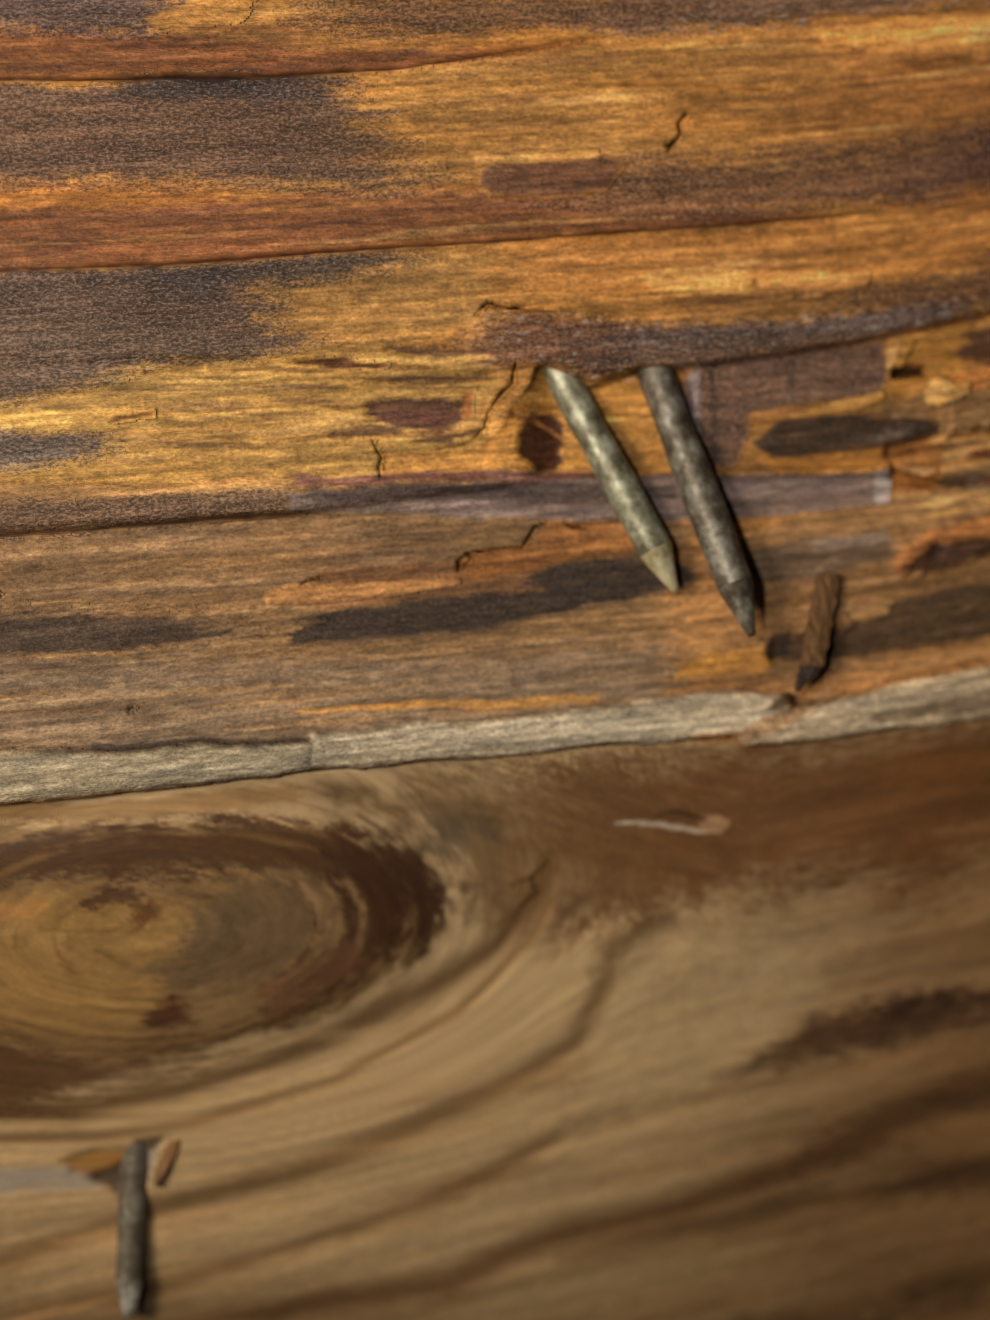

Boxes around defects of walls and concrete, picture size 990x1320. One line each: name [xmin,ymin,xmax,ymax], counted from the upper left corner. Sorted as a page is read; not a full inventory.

crack [595,81,775,153]
crack [437,362,519,452]
crack [455,519,589,573]